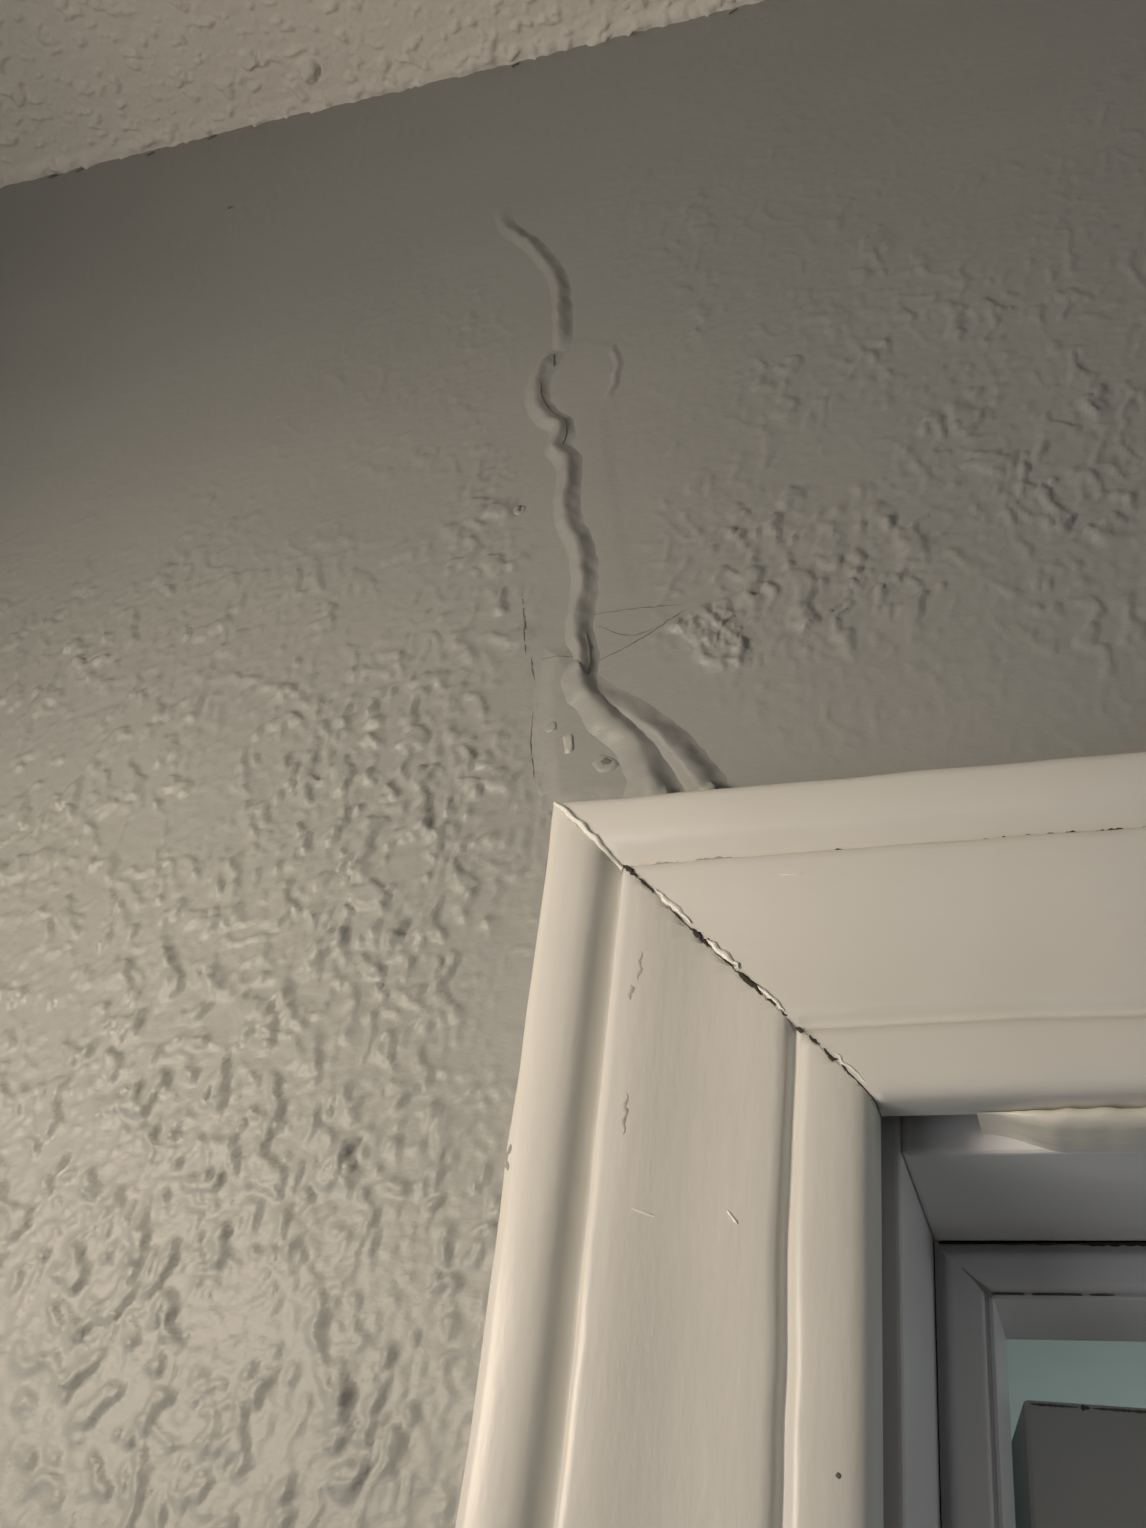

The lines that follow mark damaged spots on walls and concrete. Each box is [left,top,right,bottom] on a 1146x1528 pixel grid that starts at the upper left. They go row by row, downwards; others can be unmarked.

crack [491,199,728,798]
crack [530,715,867,1092]